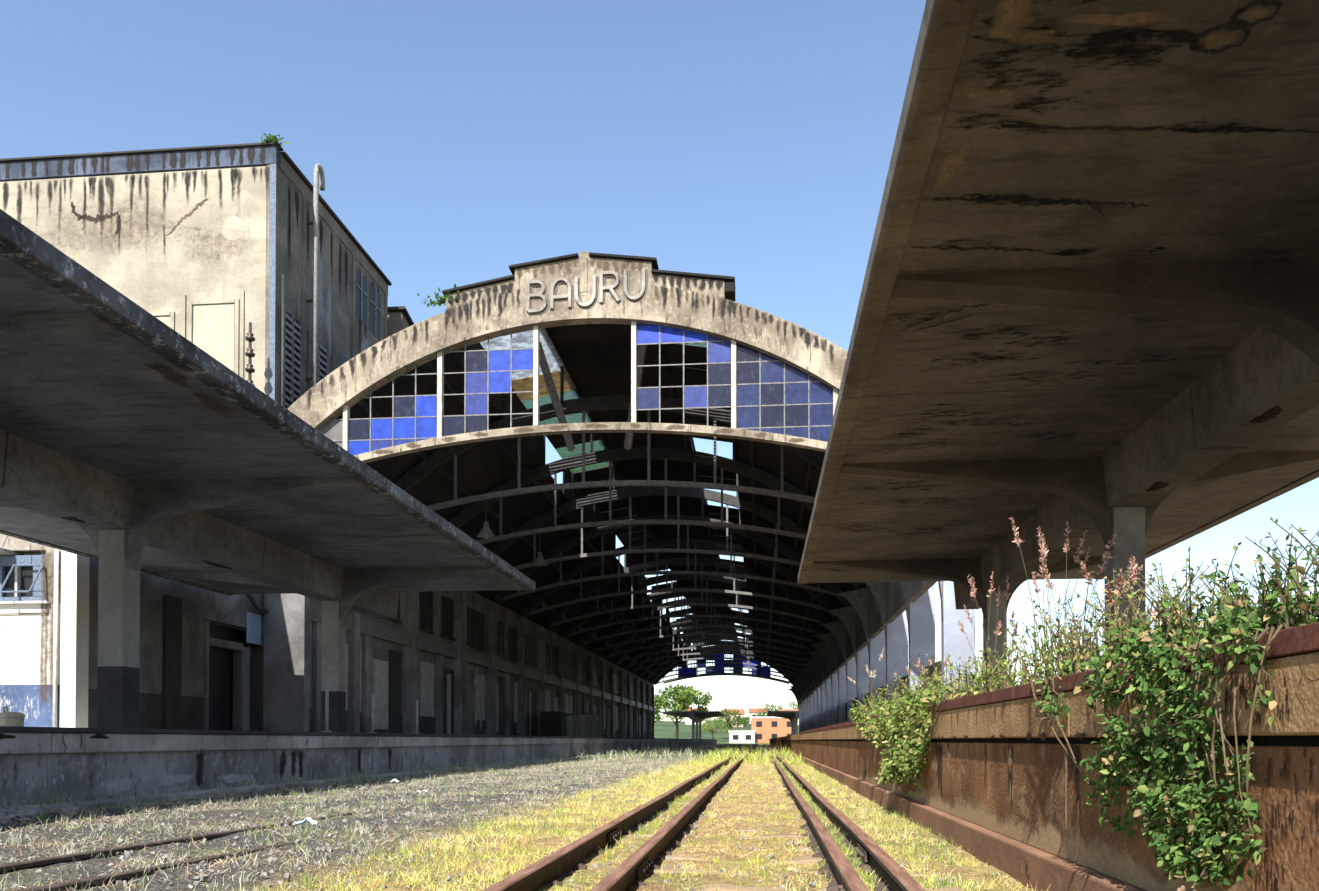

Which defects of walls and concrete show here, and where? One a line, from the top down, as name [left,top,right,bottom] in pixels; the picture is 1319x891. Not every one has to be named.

peeling [1189,0,1283,55]
crack [990,121,1319,134]
crack [71,201,121,235]
leakage [3,147,268,246]
crack [167,199,209,235]
crack [927,191,1149,216]
crack [911,239,1043,252]
crack [902,303,991,332]
leakage [859,747,1319,891]